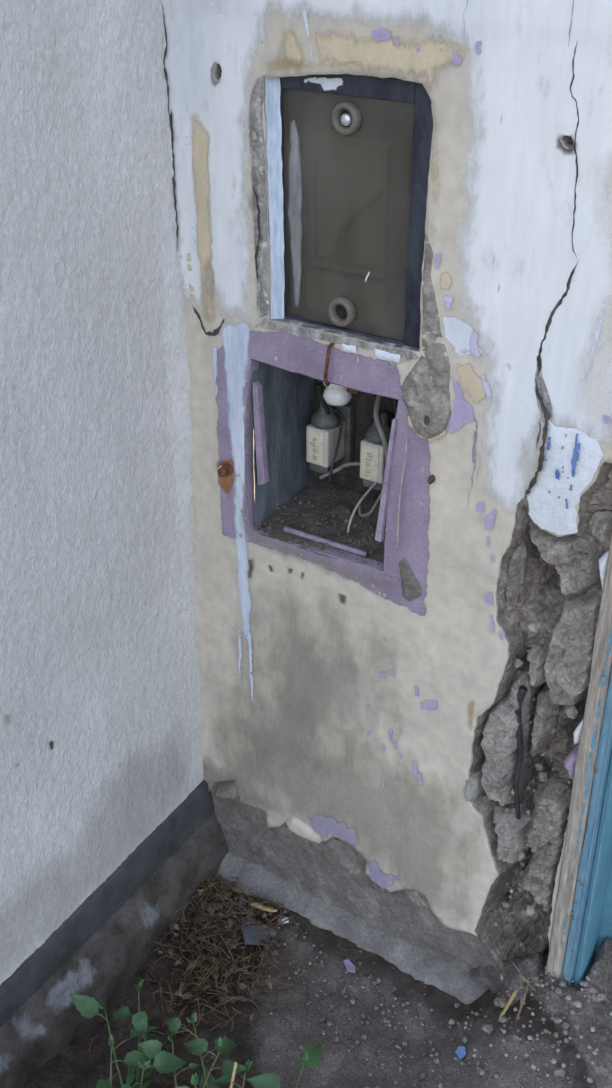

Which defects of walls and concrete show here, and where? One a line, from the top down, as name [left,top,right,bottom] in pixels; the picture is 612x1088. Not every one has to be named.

crack [161,3,179,250]
crack [191,304,224,336]
crack [525,0,579,497]
corrosion [217,461,233,493]
spalling [210,462,612,975]